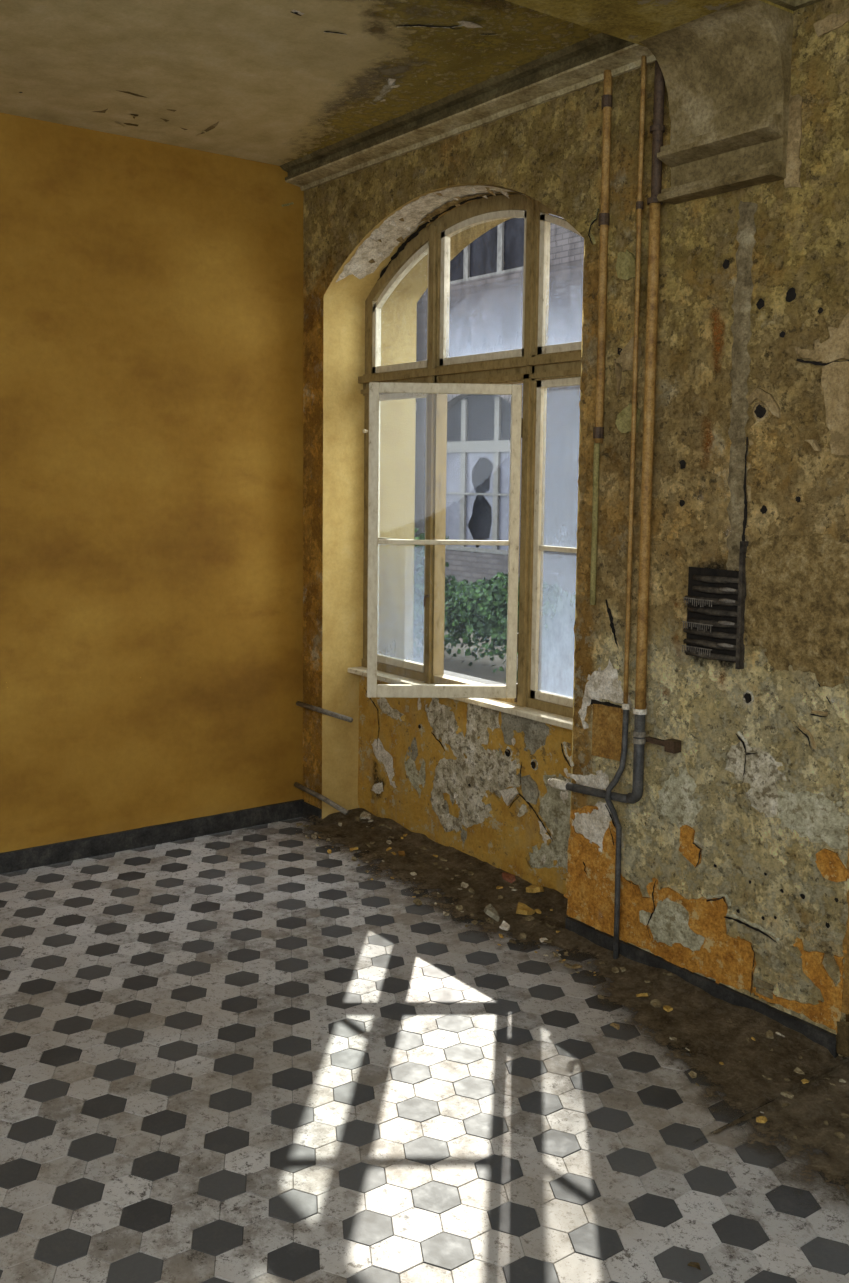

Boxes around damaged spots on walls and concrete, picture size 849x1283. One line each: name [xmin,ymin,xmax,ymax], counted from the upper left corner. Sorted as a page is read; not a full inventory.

damp [286,0,601,160]
peeling [335,185,531,283]
spalling [755,285,801,312]
peeling [779,297,849,456]
flaking render [578,659,631,729]
peeling [370,697,849,1033]